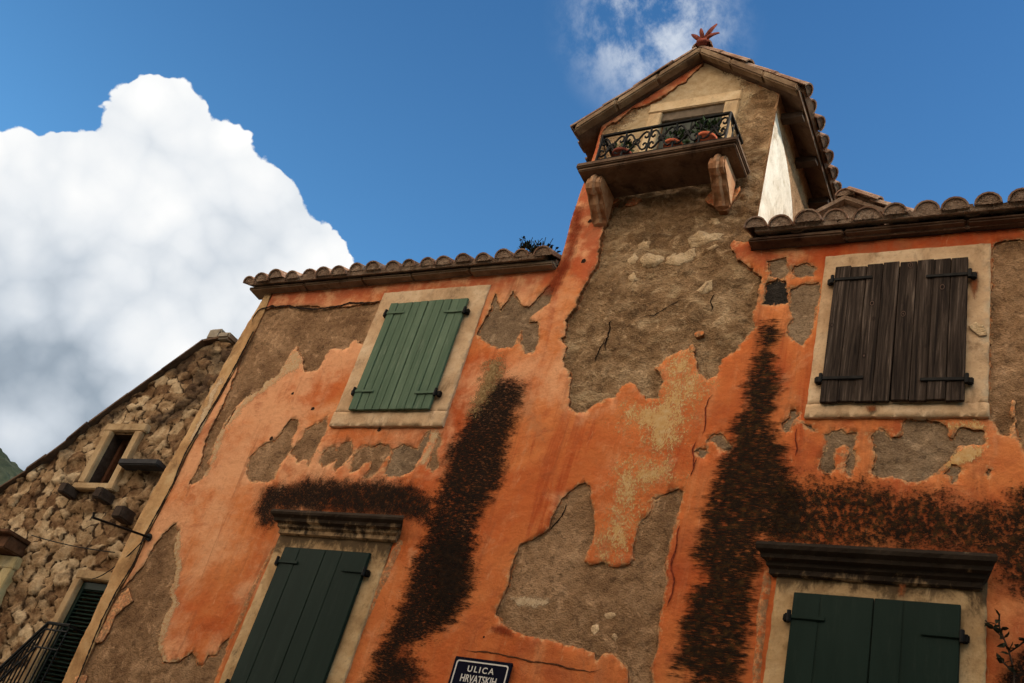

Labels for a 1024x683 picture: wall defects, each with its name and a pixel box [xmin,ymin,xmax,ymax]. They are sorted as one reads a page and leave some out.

flaking render [190,302,380,485]
flaking render [247,417,442,482]
leakage [420,428,439,464]
leakage [467,351,511,420]
flaking render [478,287,553,354]
crack [595,321,611,360]
flaking render [497,74,821,683]
flaking render [871,240,1024,484]
flaking render [72,524,229,683]
leakage [423,531,481,640]